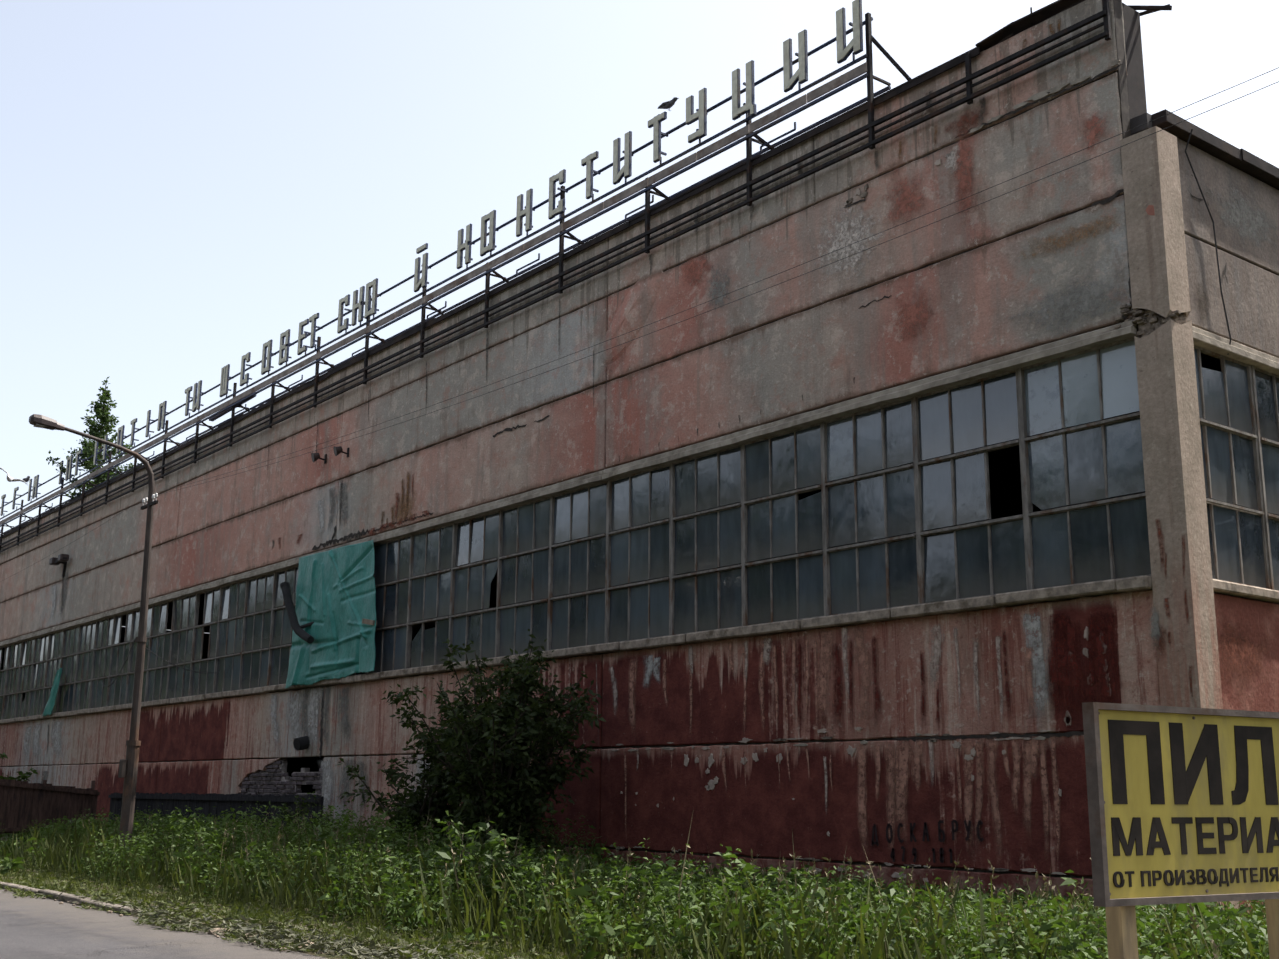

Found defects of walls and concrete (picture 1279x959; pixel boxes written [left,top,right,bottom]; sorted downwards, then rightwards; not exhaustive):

spalling [1114,301,1181,337]
corrosion [344,473,429,542]
water stain [596,655,667,725]
water stain [728,627,880,721]
water stain [920,625,979,721]
water stain [996,632,1010,717]
water stain [1023,613,1120,712]
flaking render [239,761,323,796]
peeling [612,728,833,791]
water stain [858,741,934,844]
spalling [894,710,1084,781]
water stain [956,737,1060,849]